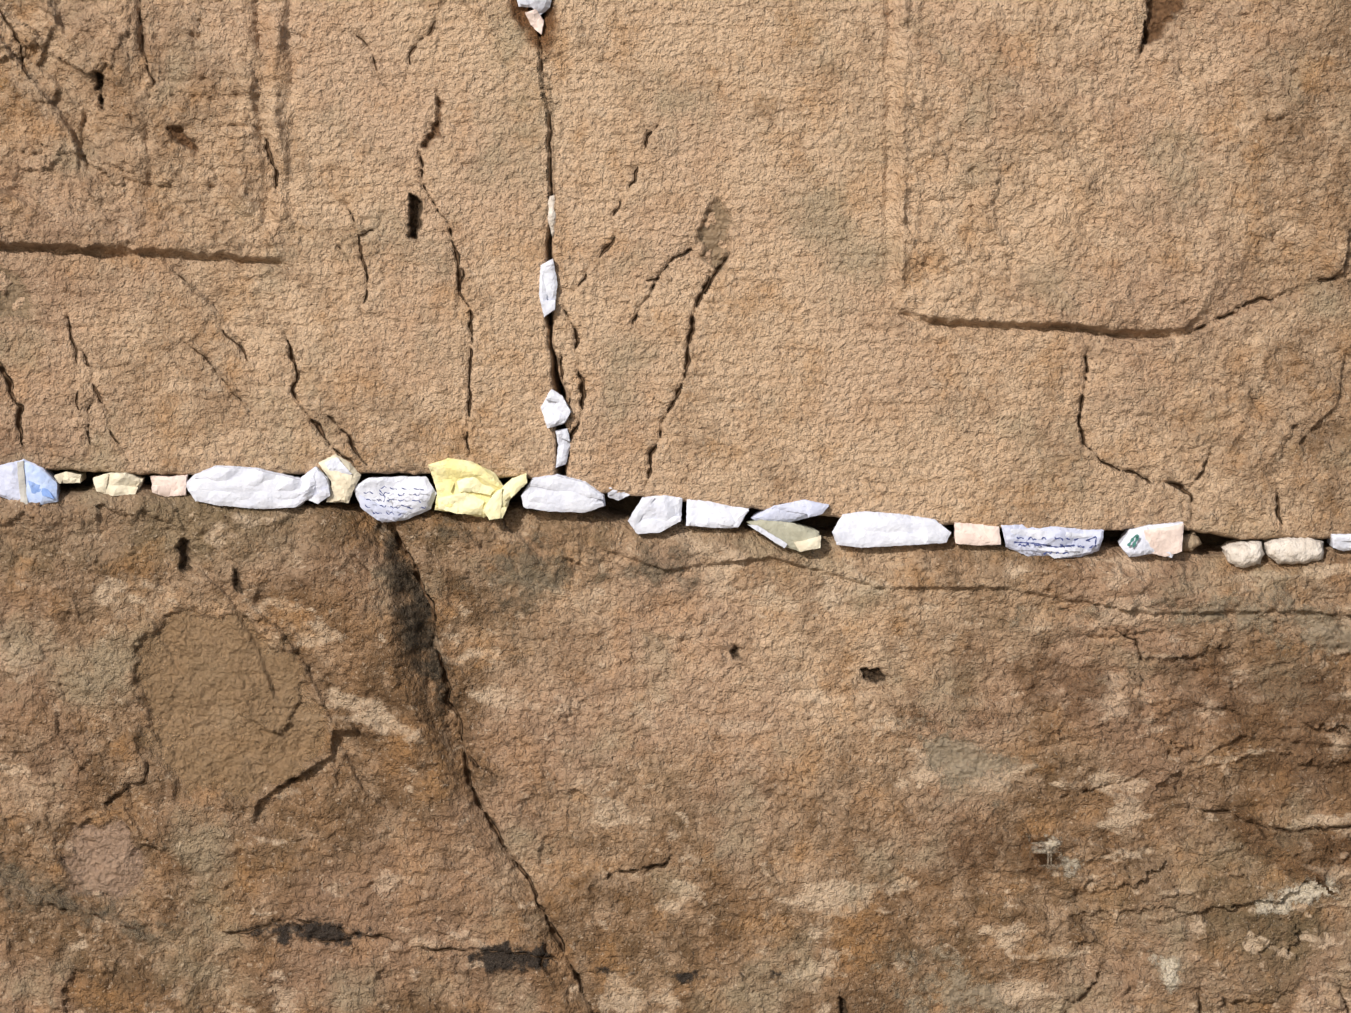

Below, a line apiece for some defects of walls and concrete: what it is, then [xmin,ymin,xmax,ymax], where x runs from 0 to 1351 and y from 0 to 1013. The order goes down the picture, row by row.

crack [0,10,28,77]
crack [409,21,435,64]
spalling [1142,0,1184,44]
crack [420,156,473,450]
crack [631,249,691,324]
crack [0,363,23,445]
crack [67,317,119,445]
crack [287,340,360,462]
crack [647,257,728,478]
crack [1078,356,1207,501]
crack [222,532,593,1013]